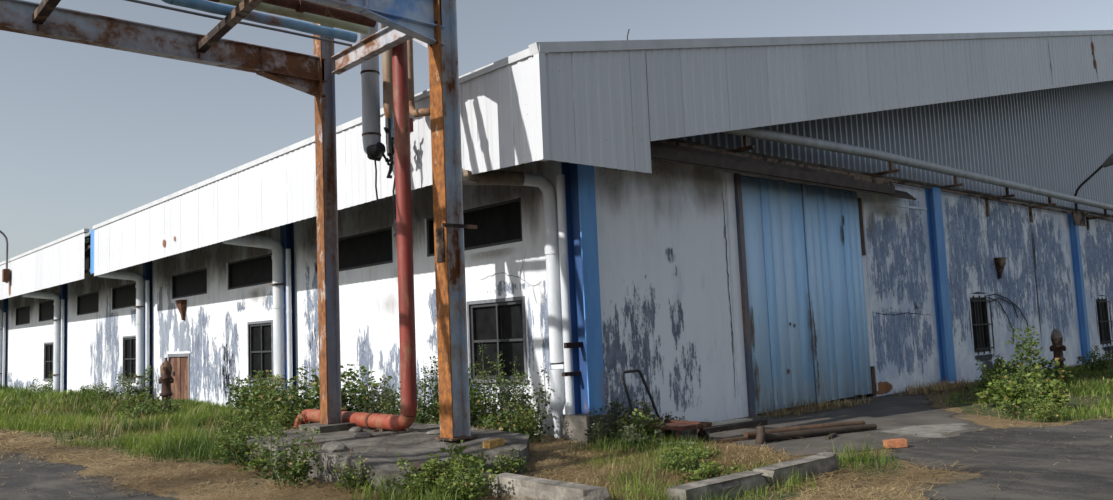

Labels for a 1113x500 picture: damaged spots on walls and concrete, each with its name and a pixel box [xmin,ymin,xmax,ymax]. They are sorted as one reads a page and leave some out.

peeling [90,293,124,393]
peeling [155,280,253,406]
peeling [304,262,319,400]
peeling [356,327,401,398]
peeling [417,360,439,407]
peeling [427,289,437,353]
crack [480,251,542,303]
peeling [603,275,701,422]
peeling [866,199,934,375]
peeling [945,192,1073,341]
peeling [1082,222,1113,327]